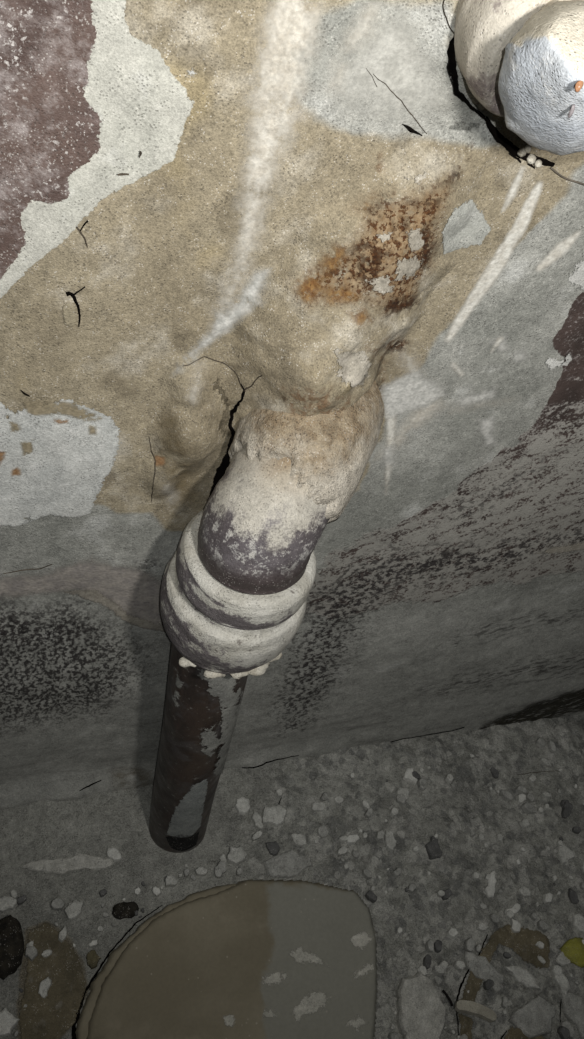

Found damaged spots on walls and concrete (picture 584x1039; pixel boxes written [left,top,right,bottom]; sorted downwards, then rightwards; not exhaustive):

water stain [338,24,435,107]
crack [63,286,85,327]
flaking render [0,0,445,537]
crack [183,356,262,497]
water stain [191,0,315,354]
corrosion [334,342,404,387]
corrosion [301,171,446,312]
water stain [382,362,444,492]
flaking render [350,121,584,501]
water stain [0,613,128,721]
water stain [278,531,584,730]
crack [456,934,488,1035]